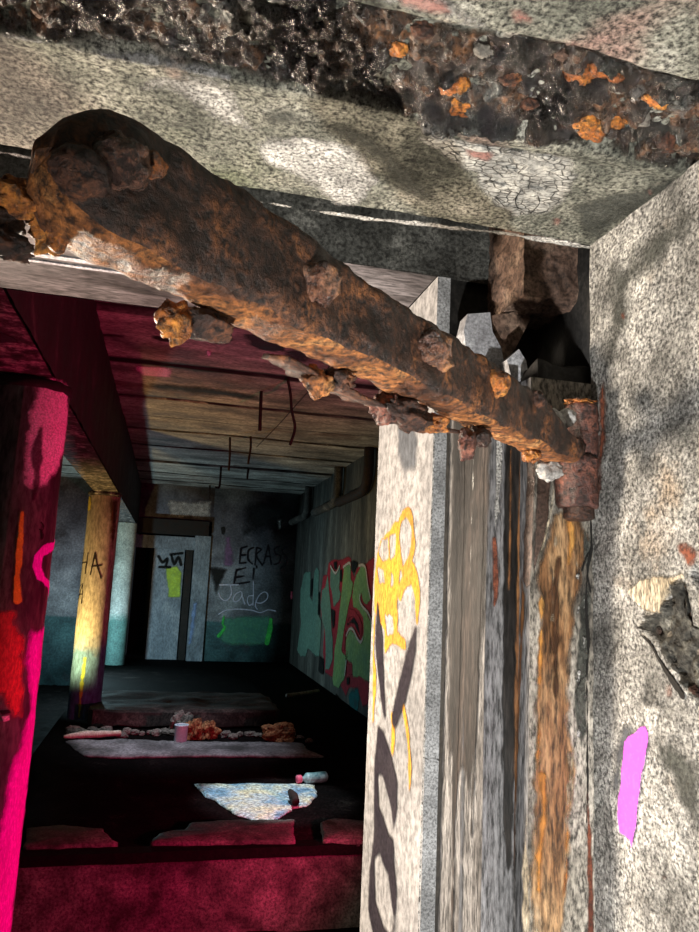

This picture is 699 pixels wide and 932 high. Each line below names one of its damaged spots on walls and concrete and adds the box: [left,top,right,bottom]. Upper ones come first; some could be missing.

corrosion [470,151,492,160]
crack [495,191,545,213]
water stain [448,421,490,932]
water stain [502,444,537,932]
corrosion [530,514,587,932]
spalling [628,574,699,701]